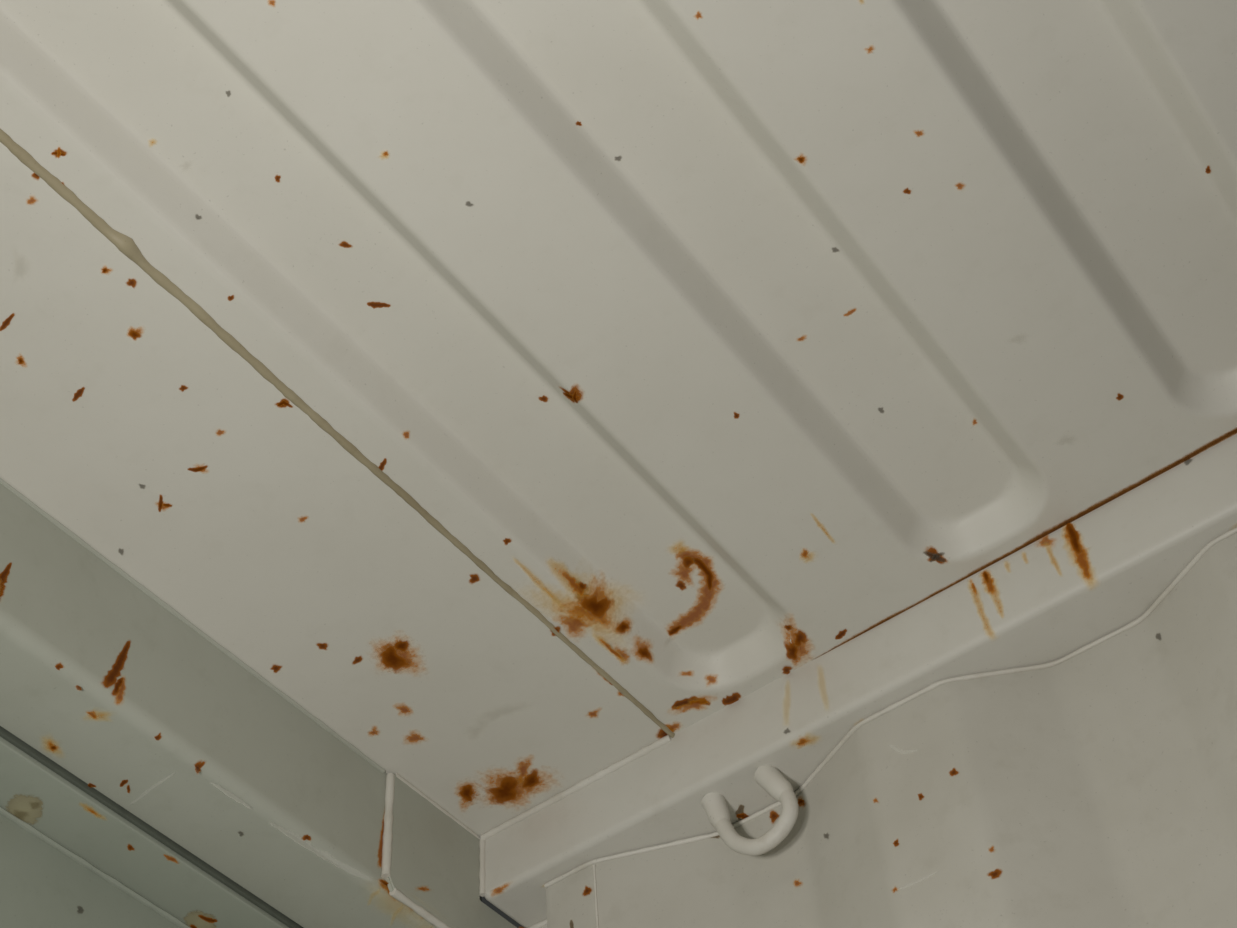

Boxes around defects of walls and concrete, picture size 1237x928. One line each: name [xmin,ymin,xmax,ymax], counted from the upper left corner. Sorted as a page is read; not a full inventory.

rust [782,428,1237,674]
rust [551,572,652,662]
rust [668,549,721,636]
rust [380,640,417,672]
rust [657,693,741,738]
rust [459,761,544,807]
rust [378,819,390,893]